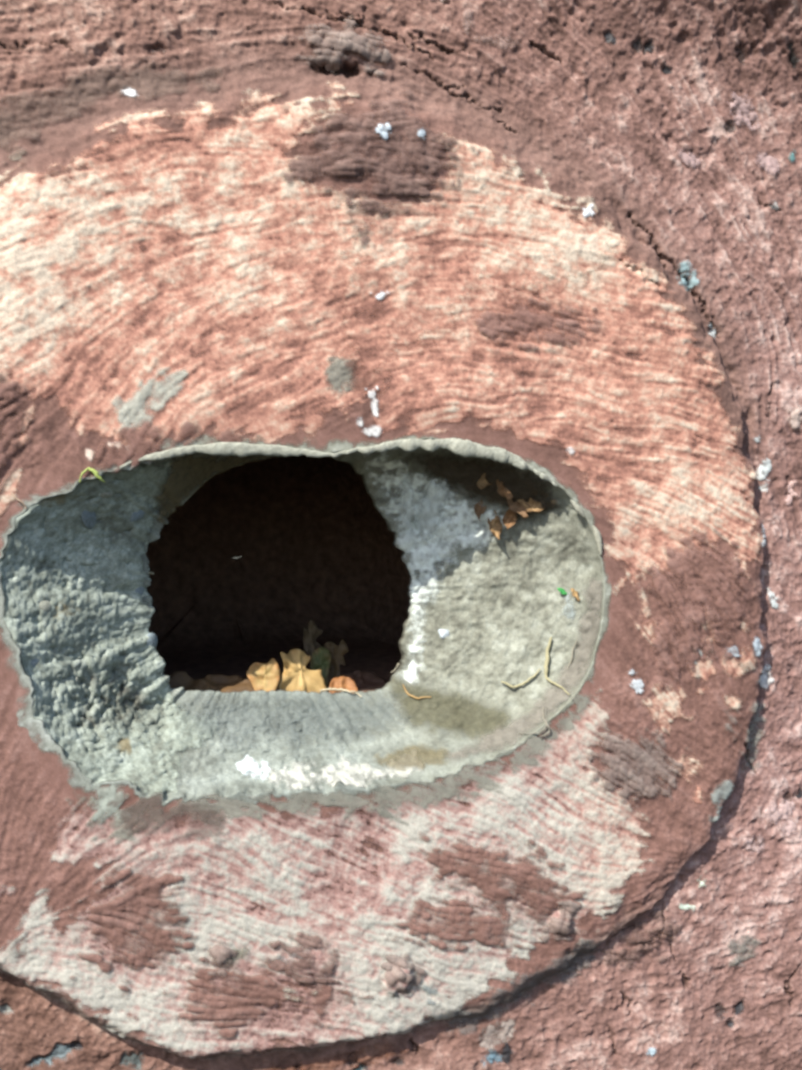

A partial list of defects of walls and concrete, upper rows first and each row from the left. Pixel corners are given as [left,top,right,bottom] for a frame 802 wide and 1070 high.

peeling [0,82,774,795]
peeling [757,152,795,174]